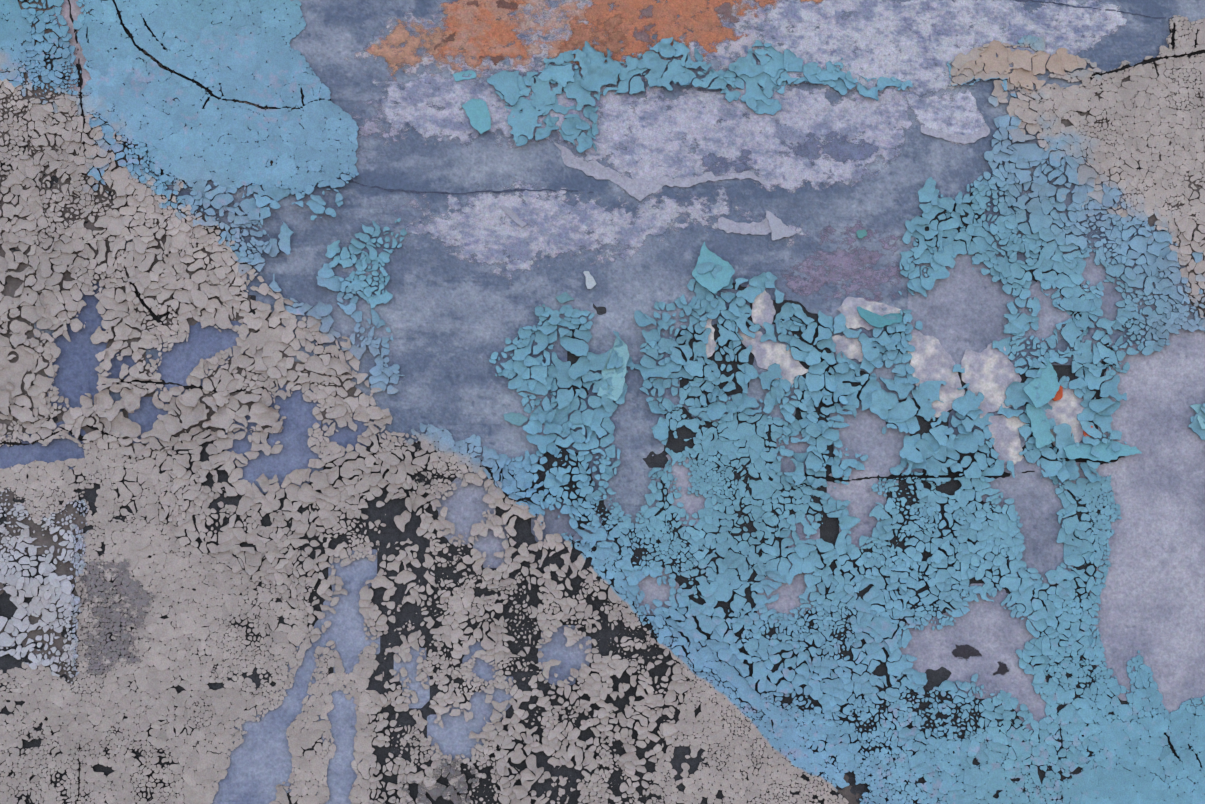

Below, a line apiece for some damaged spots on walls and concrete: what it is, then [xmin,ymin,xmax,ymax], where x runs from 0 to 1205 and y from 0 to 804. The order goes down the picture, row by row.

crack [68,0,89,152]
crack [102,0,331,111]
corrosion [366,0,778,80]
peeling [487,28,913,153]
crack [1015,0,1205,80]
peeling [552,140,771,201]
peeling [921,123,990,144]
peeling [500,205,527,228]
peeling [717,217,771,235]
peeling [766,211,795,241]
peeling [583,271,596,289]
peeling [0,490,89,684]